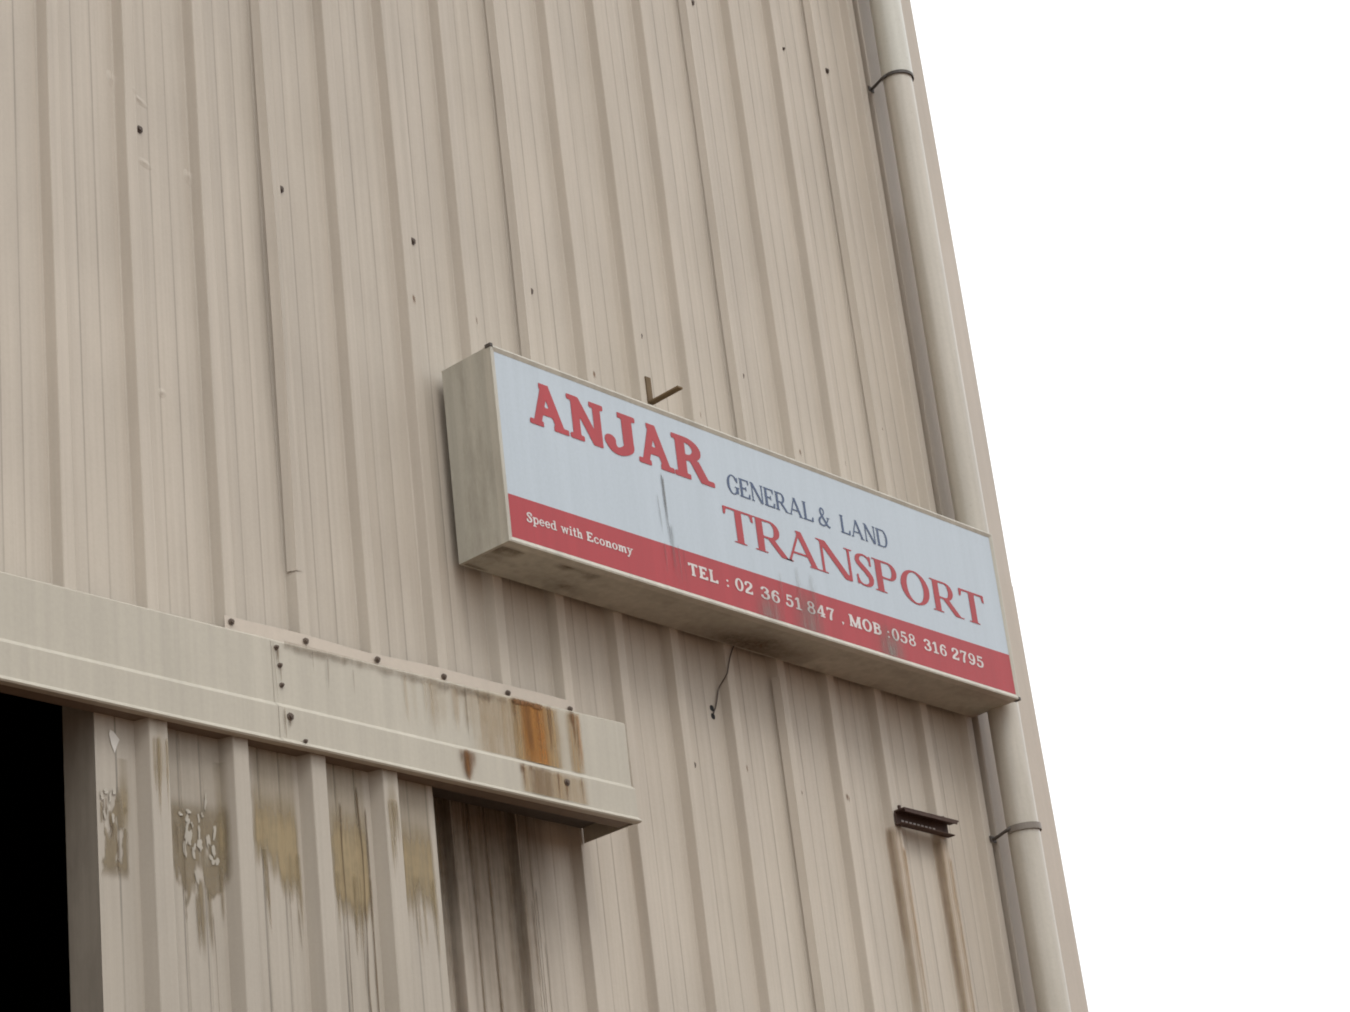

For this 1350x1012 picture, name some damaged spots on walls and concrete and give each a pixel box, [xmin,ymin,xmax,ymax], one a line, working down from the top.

rust [512,698,583,799]
peeling [100,788,128,873]
peeling [172,794,229,939]
water stain [255,800,301,892]
water stain [331,791,380,1012]
water stain [389,796,546,1012]